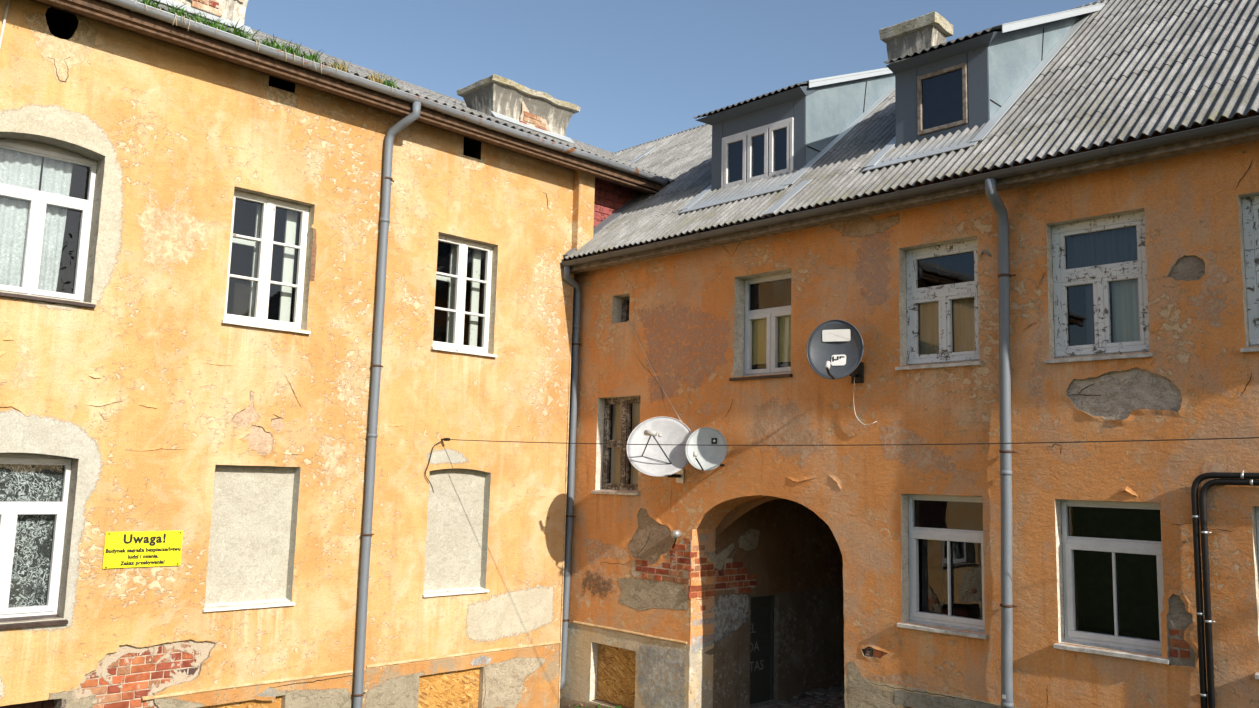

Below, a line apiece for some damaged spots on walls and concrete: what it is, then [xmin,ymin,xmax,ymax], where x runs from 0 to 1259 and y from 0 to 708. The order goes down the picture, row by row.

flaking render [1162,250,1212,287]
flaking render [1061,362,1189,426]
flaking render [617,505,760,611]
flaking render [1160,588,1199,673]
flaking render [48,634,221,708]
flaking render [278,671,425,708]
flaking render [481,657,546,708]
flaking render [846,642,897,708]